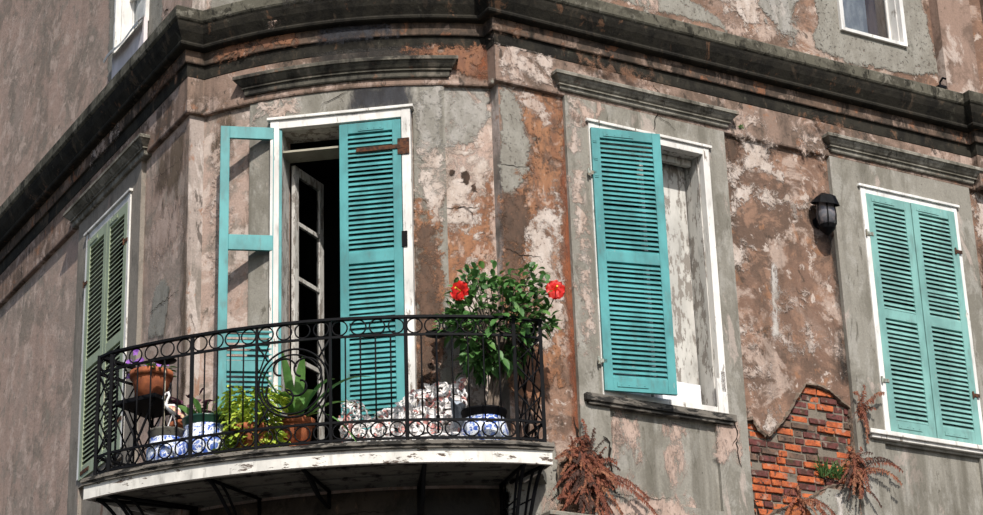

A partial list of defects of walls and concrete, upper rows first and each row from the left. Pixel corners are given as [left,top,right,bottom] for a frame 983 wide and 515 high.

corrosion [213,33,299,61]
peeling [721,0,761,36]
peeling [726,112,816,227]
peeling [412,42,604,406]
peeling [733,239,758,271]
peeling [971,192,983,241]
peeling [773,290,841,356]
peeling [743,363,772,393]
peeling [542,410,697,515]
flaking render [713,382,855,515]